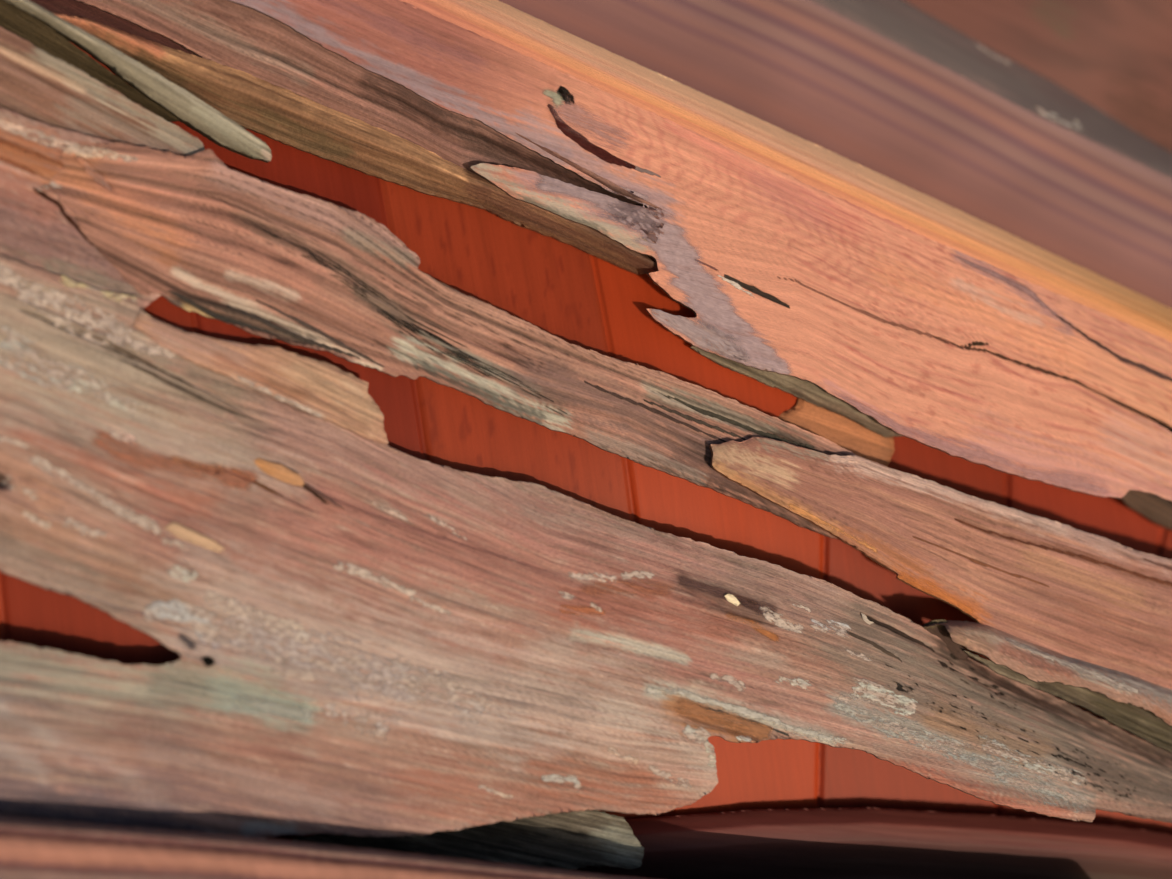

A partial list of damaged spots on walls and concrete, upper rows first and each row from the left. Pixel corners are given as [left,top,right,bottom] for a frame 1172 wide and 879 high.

peeling [63,143,138,162]
crack [547,104,661,178]
crack [694,257,1172,432]
peeling [106,310,388,445]
peeling [2,476,107,537]
peeling [373,502,408,521]
peeling [621,571,655,579]
peeling [711,673,746,691]
peeling [776,677,812,689]
peeling [980,735,1086,786]